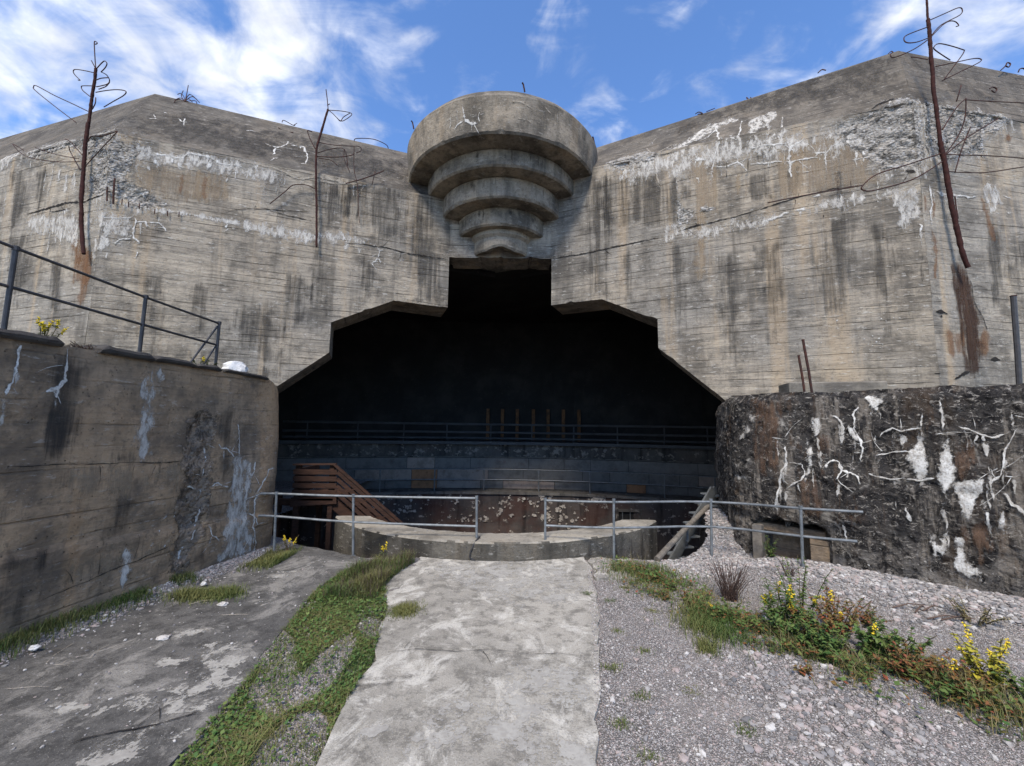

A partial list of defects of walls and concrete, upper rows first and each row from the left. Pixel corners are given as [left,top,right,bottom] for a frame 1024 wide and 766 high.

rust [12,41,127,305]
spalling [20,129,365,253]
leakage [125,143,281,201]
crack [556,139,856,259]
leakage [618,112,1013,272]
rust [768,0,1024,373]
spalling [832,97,1015,183]
spalling [151,409,219,575]
peeling [447,494,583,530]
leakage [804,395,883,489]
leakage [900,433,984,590]
leakage [985,493,1024,532]